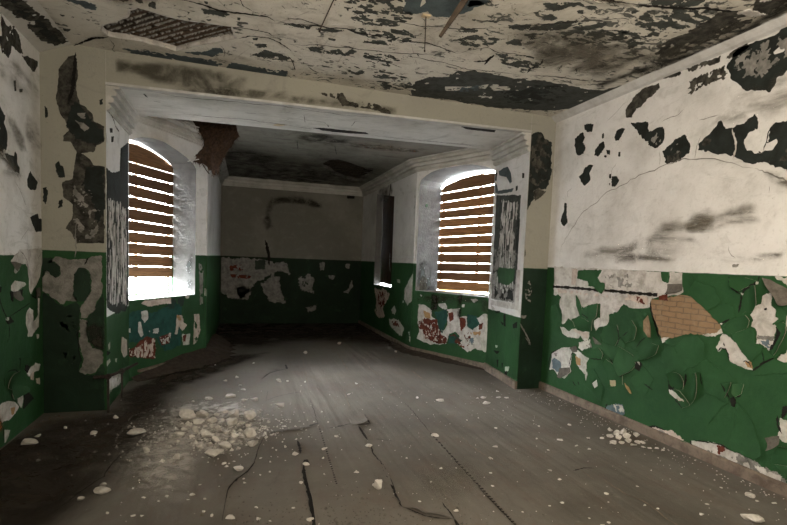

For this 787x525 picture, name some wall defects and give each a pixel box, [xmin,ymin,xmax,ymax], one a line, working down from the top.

peeling [0,107,48,204]
peeling [0,0,71,72]
peeling [284,0,714,111]
peeling [579,165,593,186]
peeling [574,123,621,158]
crack [562,115,787,245]
peeling [614,27,787,170]
flaking render [0,363,40,443]
flaking render [0,248,207,374]
flaking render [221,257,314,304]
flaking render [374,267,521,375]
peeling [545,266,787,484]